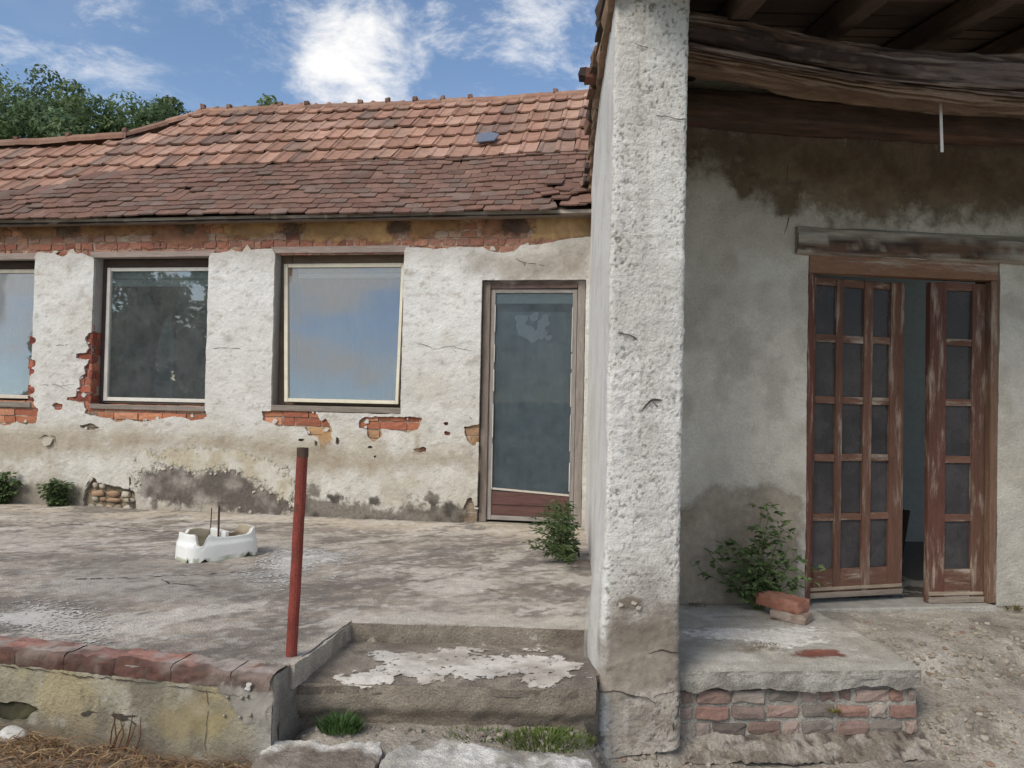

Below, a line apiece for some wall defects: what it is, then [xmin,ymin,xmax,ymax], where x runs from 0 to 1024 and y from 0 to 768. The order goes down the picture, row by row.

damp [686,127,1024,229]
spalling [0,218,591,257]
spalling [0,359,38,426]
spalling [54,325,207,430]
spalling [263,411,340,446]
spalling [359,413,422,458]
spalling [465,418,480,447]
damp [139,464,466,523]
peeling [333,646,596,689]
crack [1,665,239,750]